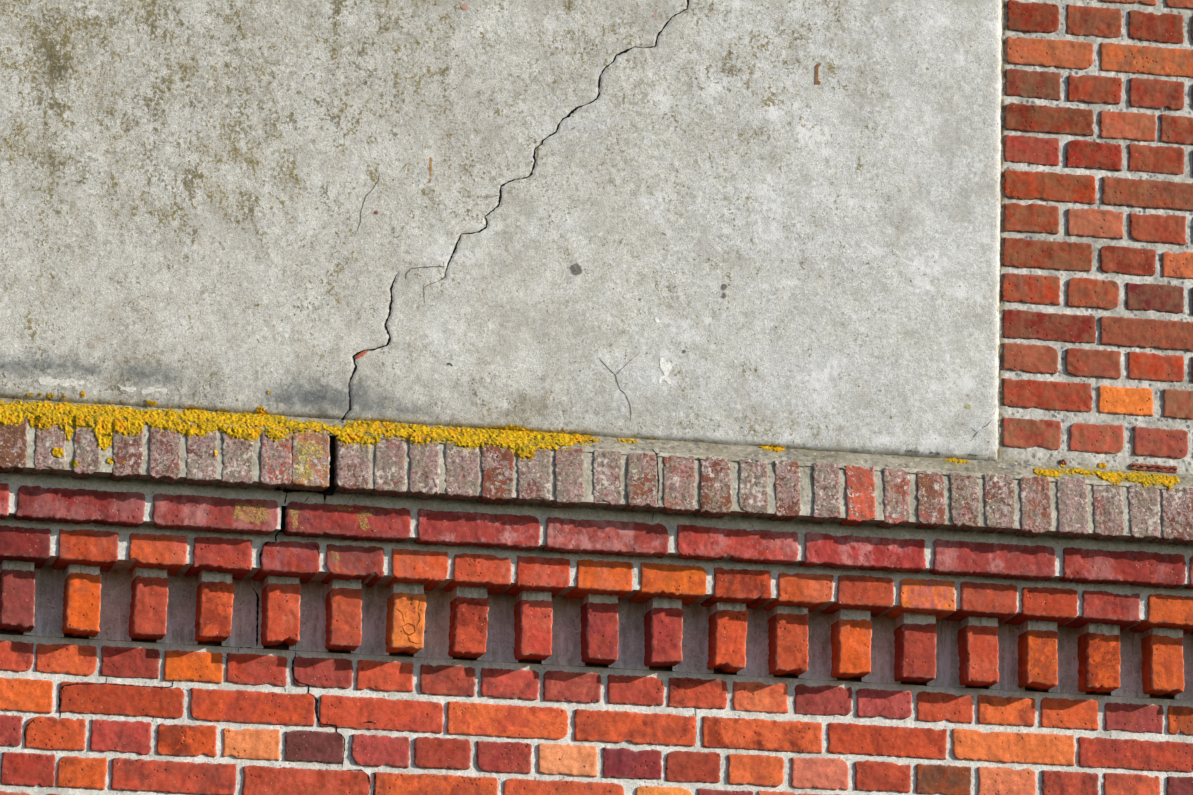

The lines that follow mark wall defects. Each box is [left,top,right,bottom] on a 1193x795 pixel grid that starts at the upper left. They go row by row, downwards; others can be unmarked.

crack [221,0,689,666]